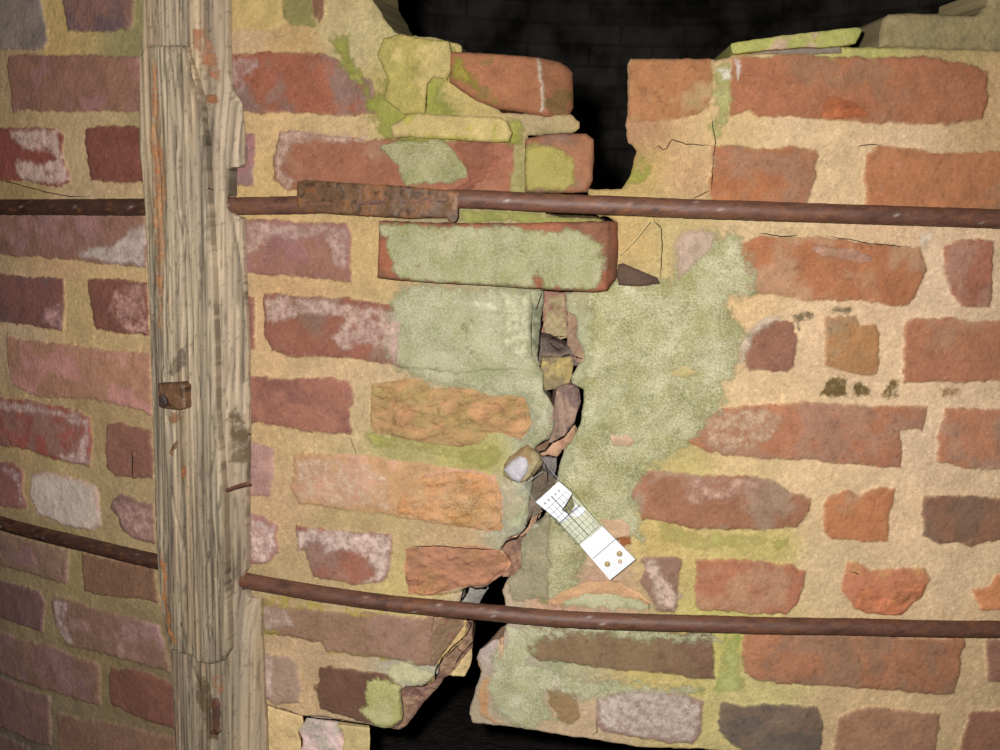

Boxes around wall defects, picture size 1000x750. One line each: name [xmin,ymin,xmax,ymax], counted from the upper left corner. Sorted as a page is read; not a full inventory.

spalling [822,96,869,119]
spalling [455,141,499,190]
spalling [525,133,597,195]
crack [653,121,716,199]
damp [675,231,715,276]
damp [453,291,532,358]
damp [707,410,779,453]
crack [275,290,584,730]
damp [685,478,762,504]